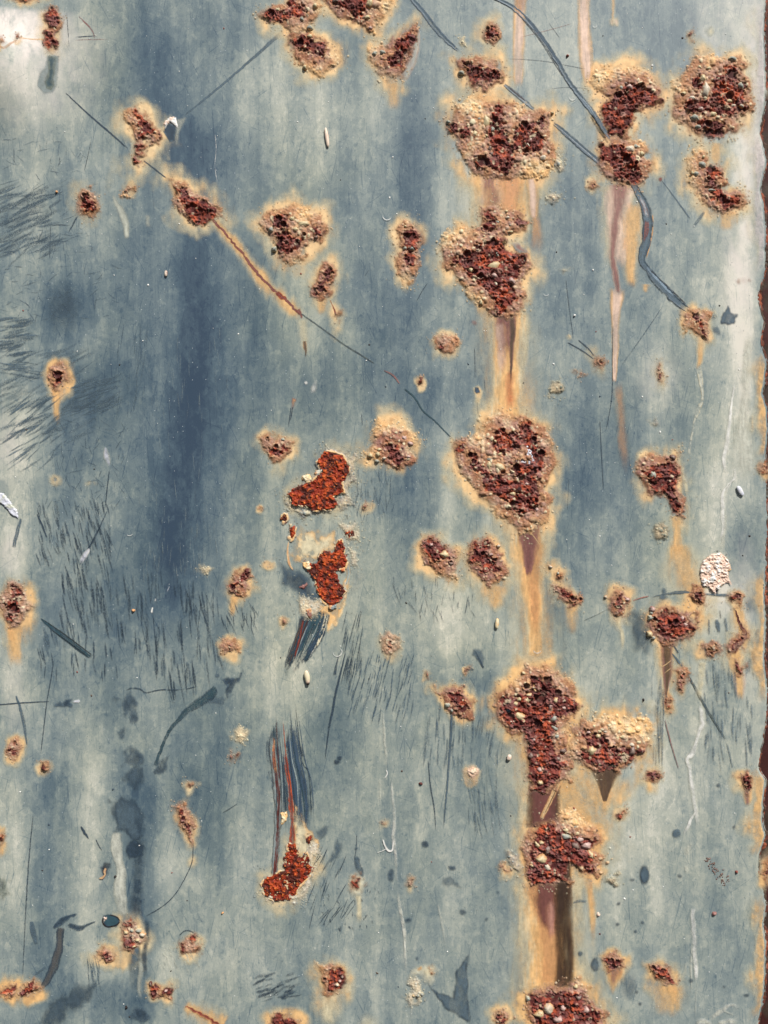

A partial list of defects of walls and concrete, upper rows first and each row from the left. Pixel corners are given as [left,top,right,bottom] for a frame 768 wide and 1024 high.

corrosion [250,189,344,330]
corrosion [359,408,427,471]
corrosion [389,0,681,1024]
corrosion [577,0,768,1024]